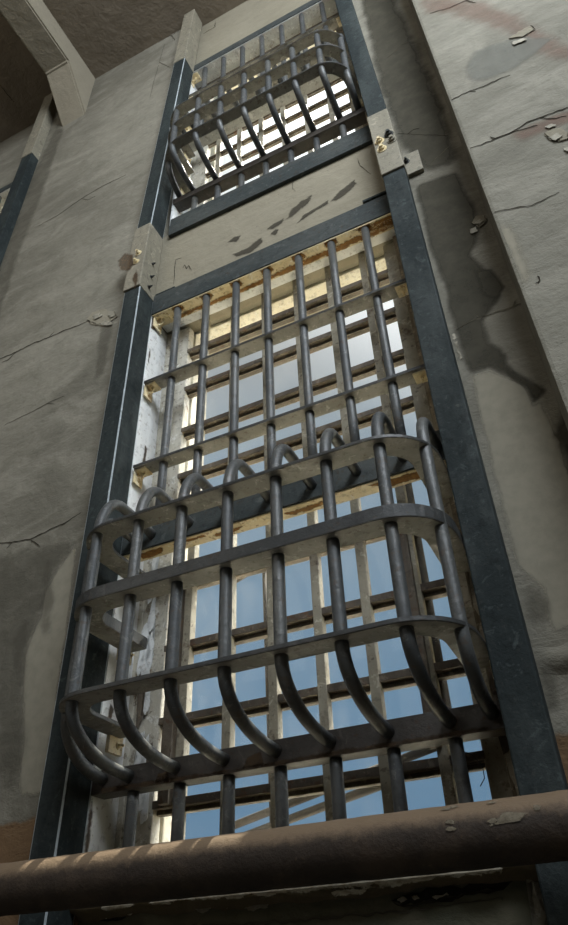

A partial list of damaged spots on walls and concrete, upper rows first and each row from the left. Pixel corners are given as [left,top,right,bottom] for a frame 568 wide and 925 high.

crack [470,107,568,149]
spalling [544,124,568,151]
crack [0,320,90,362]
crack [4,512,81,548]